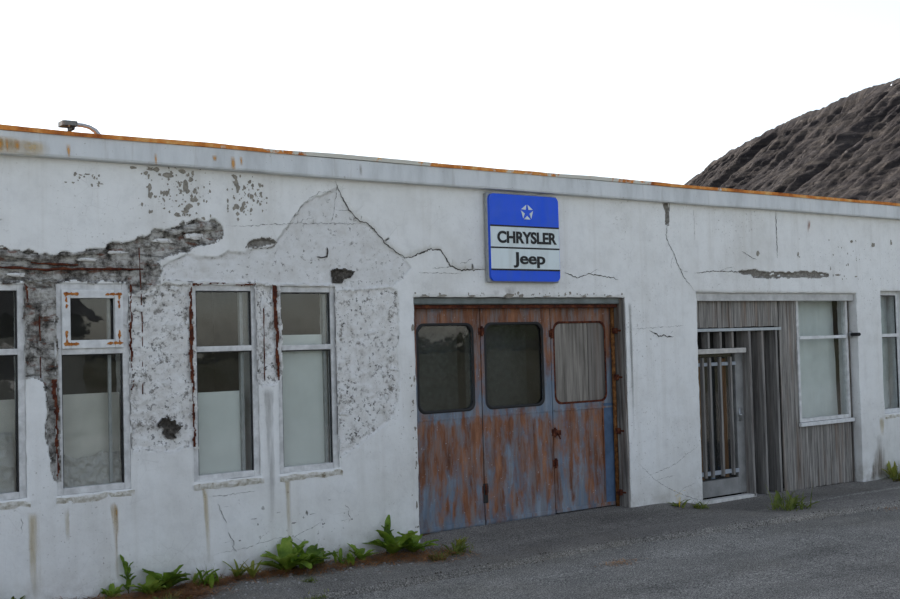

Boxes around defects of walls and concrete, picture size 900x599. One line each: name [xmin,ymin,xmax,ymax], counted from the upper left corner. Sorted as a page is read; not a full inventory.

crack [244,179,486,274]
crack [666,220,778,289]
spalling [739,240,875,280]
rust [188,282,224,447]
spalling [0,166,415,482]